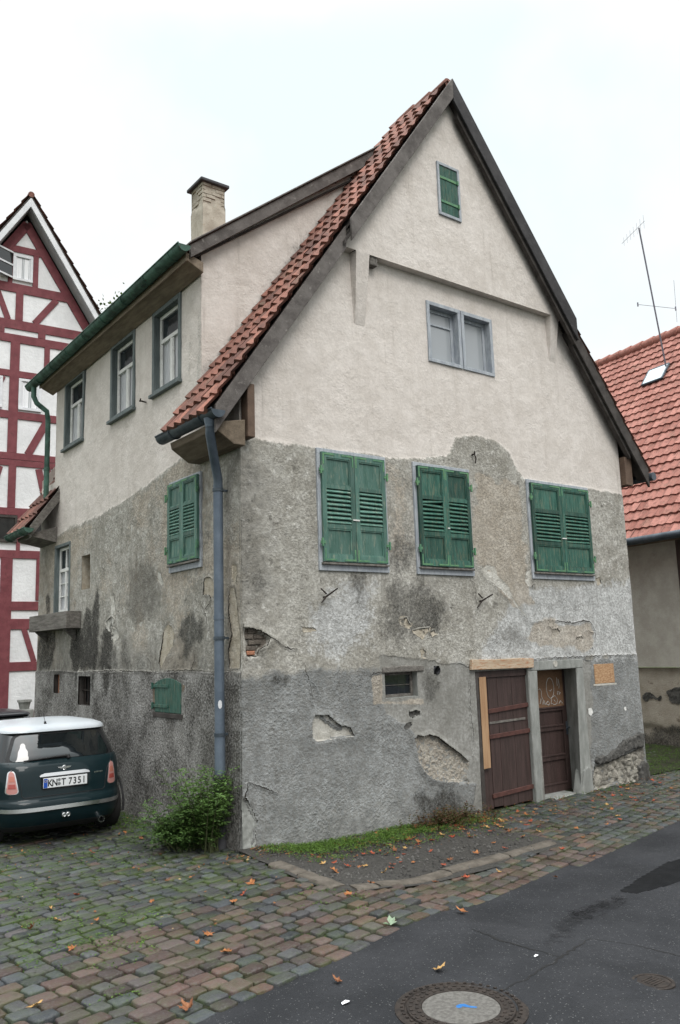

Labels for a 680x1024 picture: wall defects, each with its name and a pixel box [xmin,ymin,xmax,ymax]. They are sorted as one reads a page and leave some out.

leakage [70,586,130,696]
flaking render [227,564,290,669]
peeling [399,615,438,659]
flaking render [307,709,356,742]
flaking render [404,707,469,788]